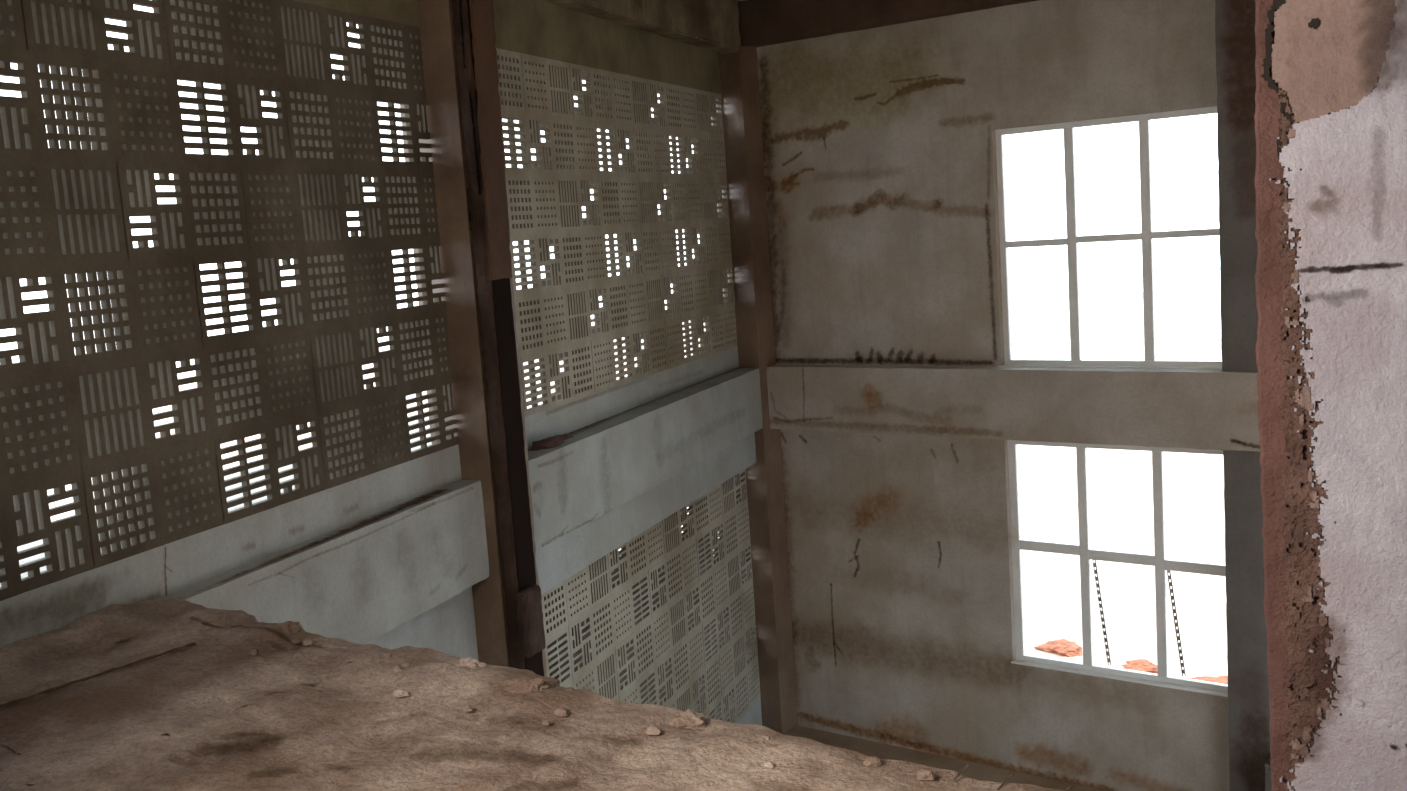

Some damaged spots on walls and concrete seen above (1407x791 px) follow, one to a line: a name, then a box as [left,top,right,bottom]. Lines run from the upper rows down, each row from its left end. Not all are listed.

crack [1262,0,1295,157]
flaking render [1271,0,1397,149]
flaking render [1277,166,1345,791]